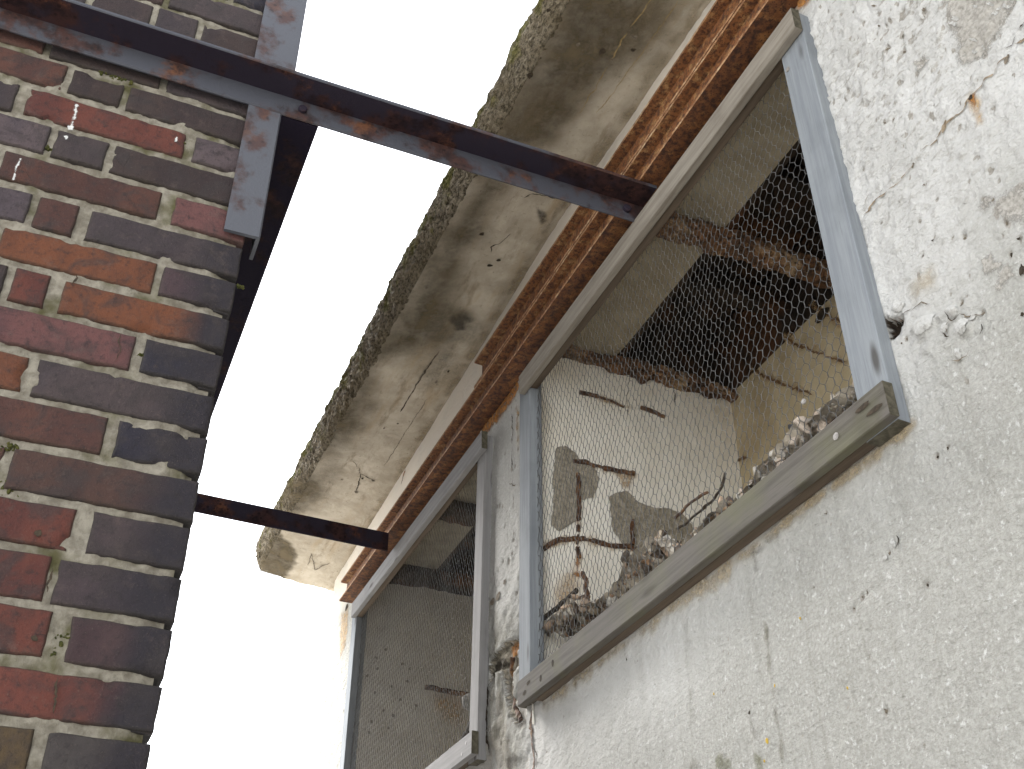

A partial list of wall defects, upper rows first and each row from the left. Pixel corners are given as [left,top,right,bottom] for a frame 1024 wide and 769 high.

damp [489,0,662,143]
crack [864,24,1024,214]
damp [381,180,500,355]
hole [885,309,910,344]
rust [481,382,519,432]
rust [579,390,624,408]
rust [563,344,739,403]
damp [281,479,321,510]
flaking render [551,446,600,531]
flaking render [609,491,693,547]
damp [258,536,296,579]
spalling [485,640,525,750]